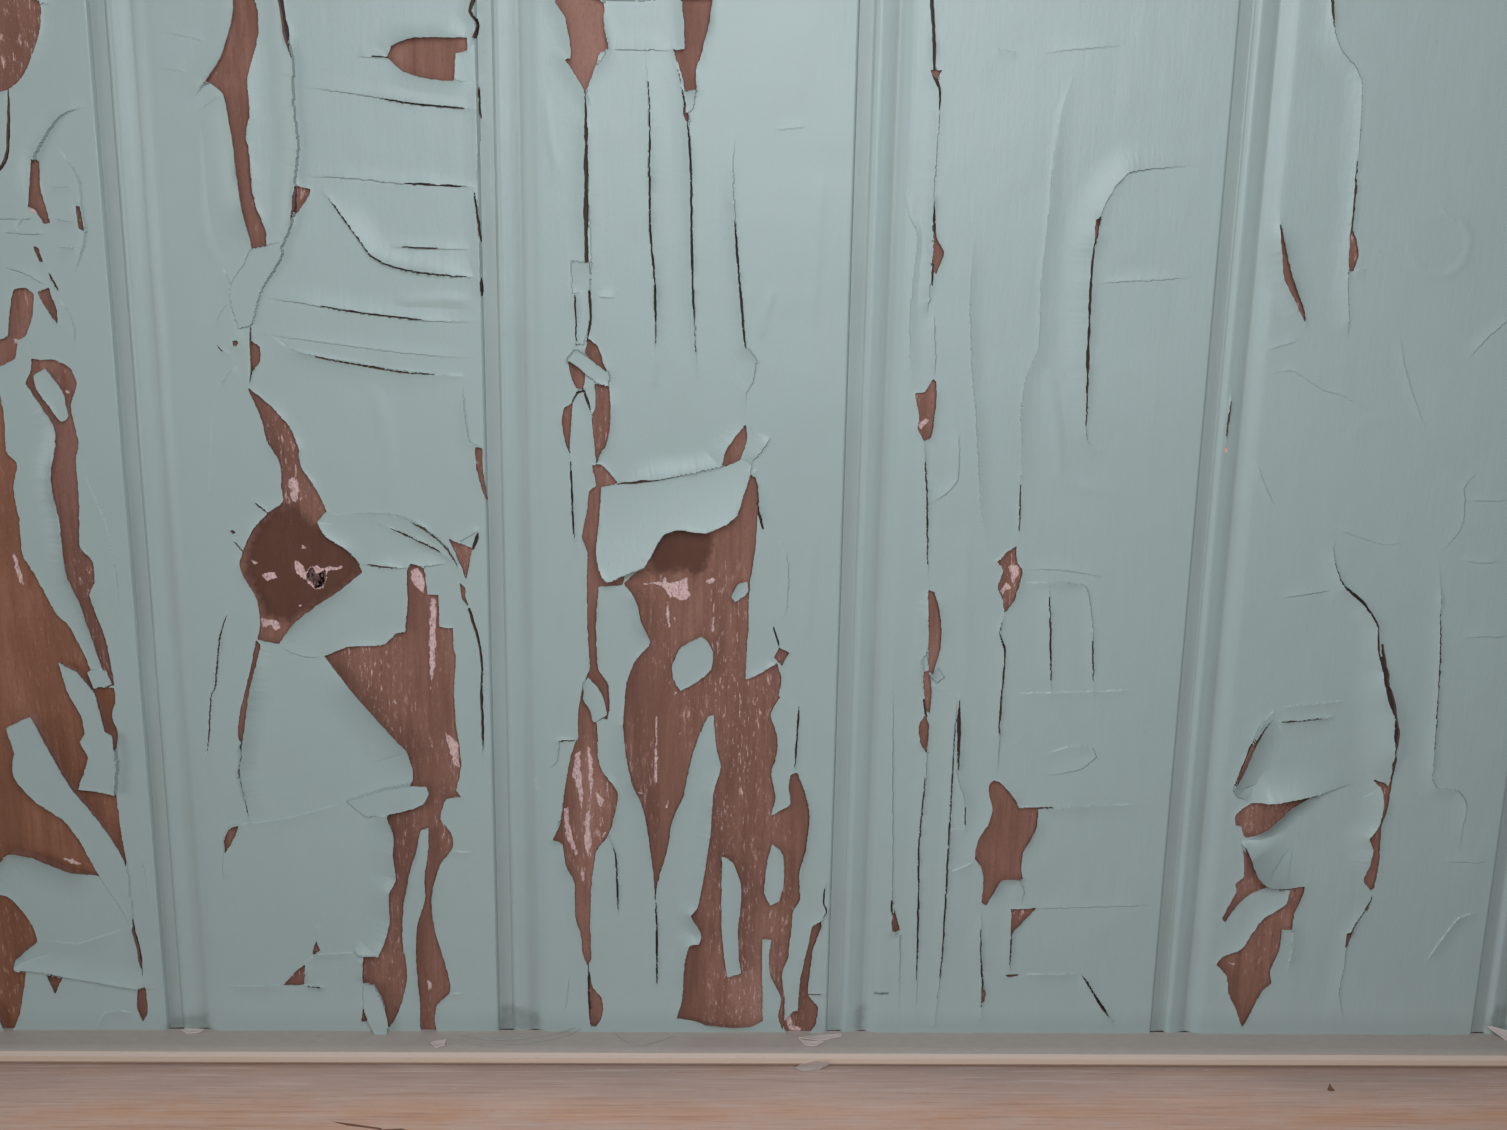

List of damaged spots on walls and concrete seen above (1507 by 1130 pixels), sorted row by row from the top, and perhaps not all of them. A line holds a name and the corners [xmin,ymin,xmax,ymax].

crack [257,0,484,389]
peeling [543,0,717,123]
crack [906,0,1188,547]
crack [1264,0,1366,335]
peeling [0,0,154,1031]
peeling [162,0,488,1048]
peeling [534,263,841,1071]
crack [934,695,1110,1019]
peeling [966,547,1146,968]
crack [1018,581,1127,700]
peeling [1217,700,1351,1024]
crack [1284,544,1485,1016]